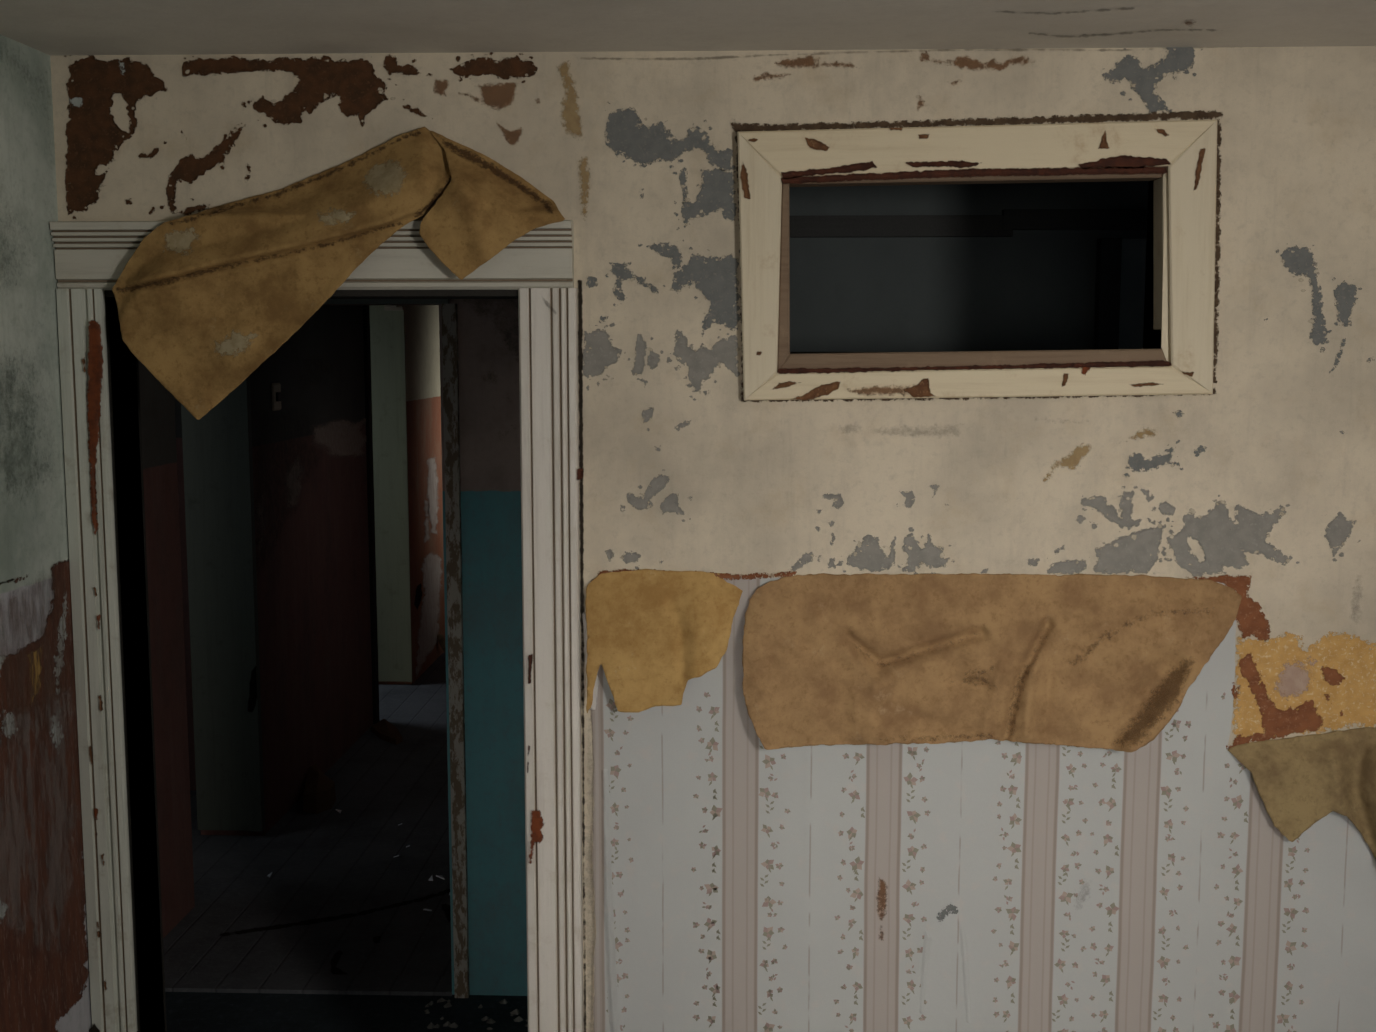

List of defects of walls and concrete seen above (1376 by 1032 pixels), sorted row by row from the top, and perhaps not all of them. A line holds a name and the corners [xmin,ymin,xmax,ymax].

peeling [1102,47,1202,113]
peeling [64,55,167,219]
peeling [149,52,538,221]
peeling [781,131,1171,184]
peeling [1194,148,1205,190]
peeling [582,103,750,401]
peeling [1276,245,1362,373]
peeling [773,360,1194,401]
peeling [591,549,671,581]
peeling [620,469,692,522]
peeling [710,491,954,581]
peeling [0,559,107,1032]